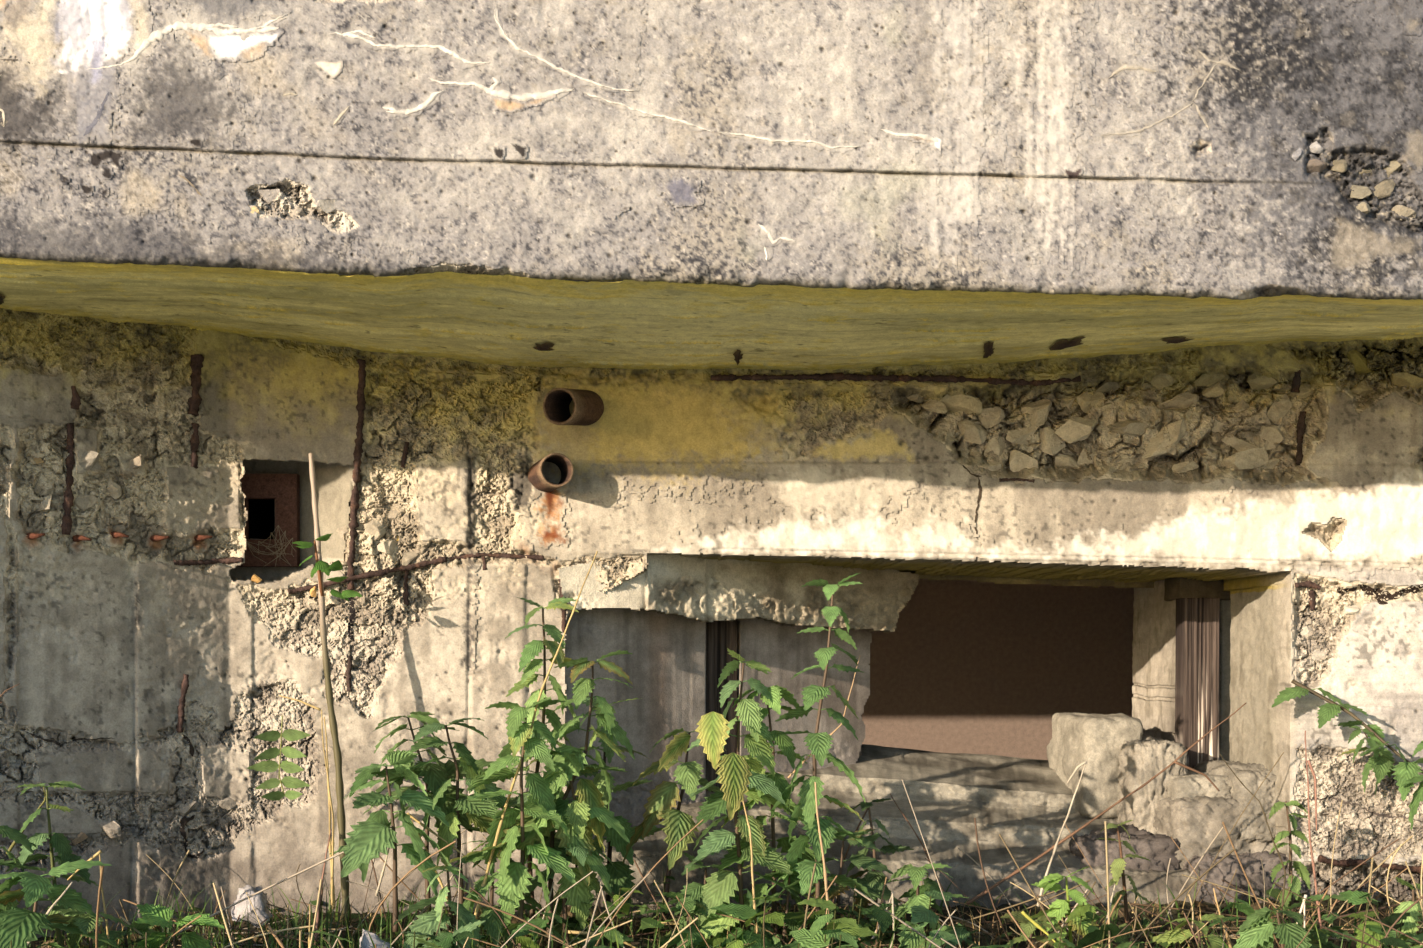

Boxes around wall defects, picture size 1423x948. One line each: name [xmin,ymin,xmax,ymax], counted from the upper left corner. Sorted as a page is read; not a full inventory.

crack [83,10,286,136]
crack [329,0,943,154]
spalling [244,178,359,234]
peeling [1292,125,1423,276]
rust [187,354,204,469]
spalling [591,337,1423,487]
rust [288,359,571,633]
spalling [0,308,647,874]
spalling [1291,573,1423,689]